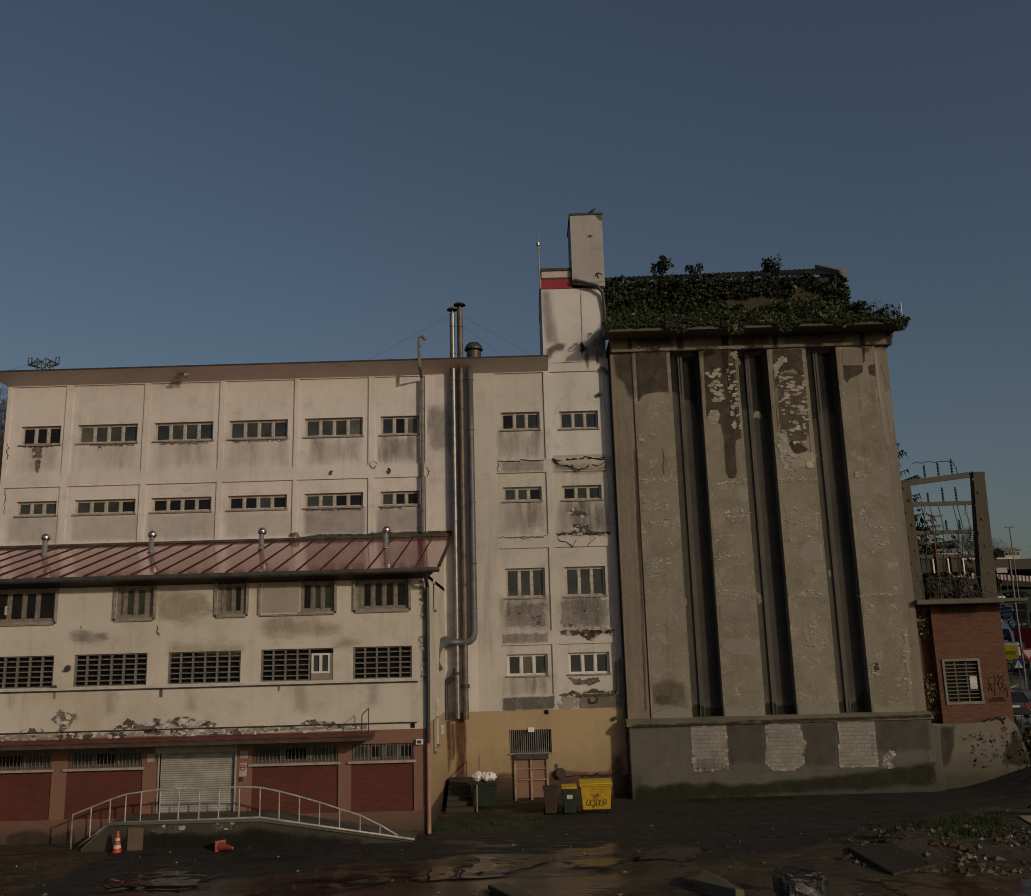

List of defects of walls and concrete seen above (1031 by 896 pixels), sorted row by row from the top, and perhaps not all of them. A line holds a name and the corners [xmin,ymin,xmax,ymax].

water stain [545,294,564,357]
peeling [702,345,743,430]
peeling [772,356,818,483]
peeling [555,508,610,536]
spalling [560,599,615,641]
spalling [558,677,616,709]
peeling [0,709,367,741]
peeling [644,723,821,788]
peeling [836,721,896,769]